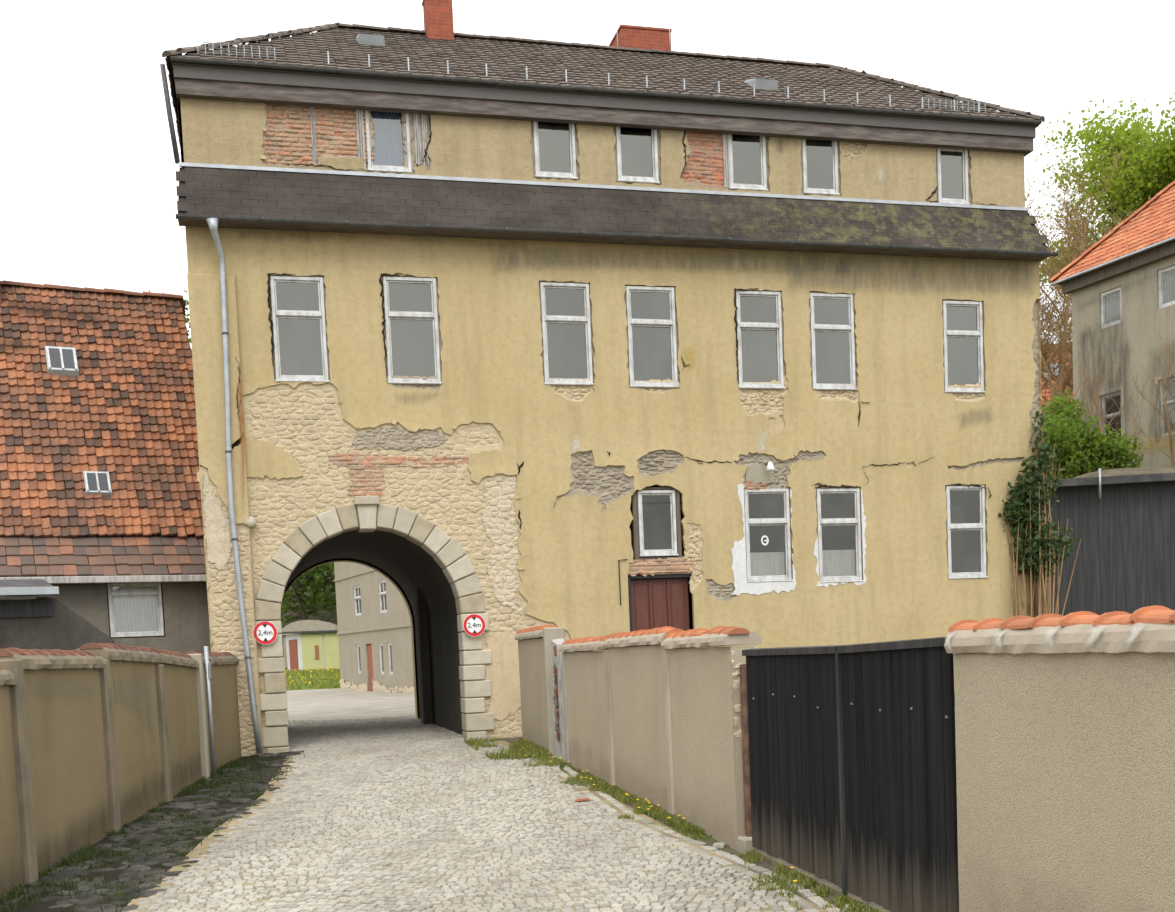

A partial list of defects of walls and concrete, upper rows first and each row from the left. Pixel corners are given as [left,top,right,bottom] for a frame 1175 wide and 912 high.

flaking render [260,103,375,167]
flaking render [680,131,729,190]
peeling [386,374,442,390]
peeling [551,378,594,402]
peeling [738,375,789,435]
peeling [556,450,684,511]
crack [815,457,933,488]
crack [947,483,992,499]
peeling [197,382,571,757]